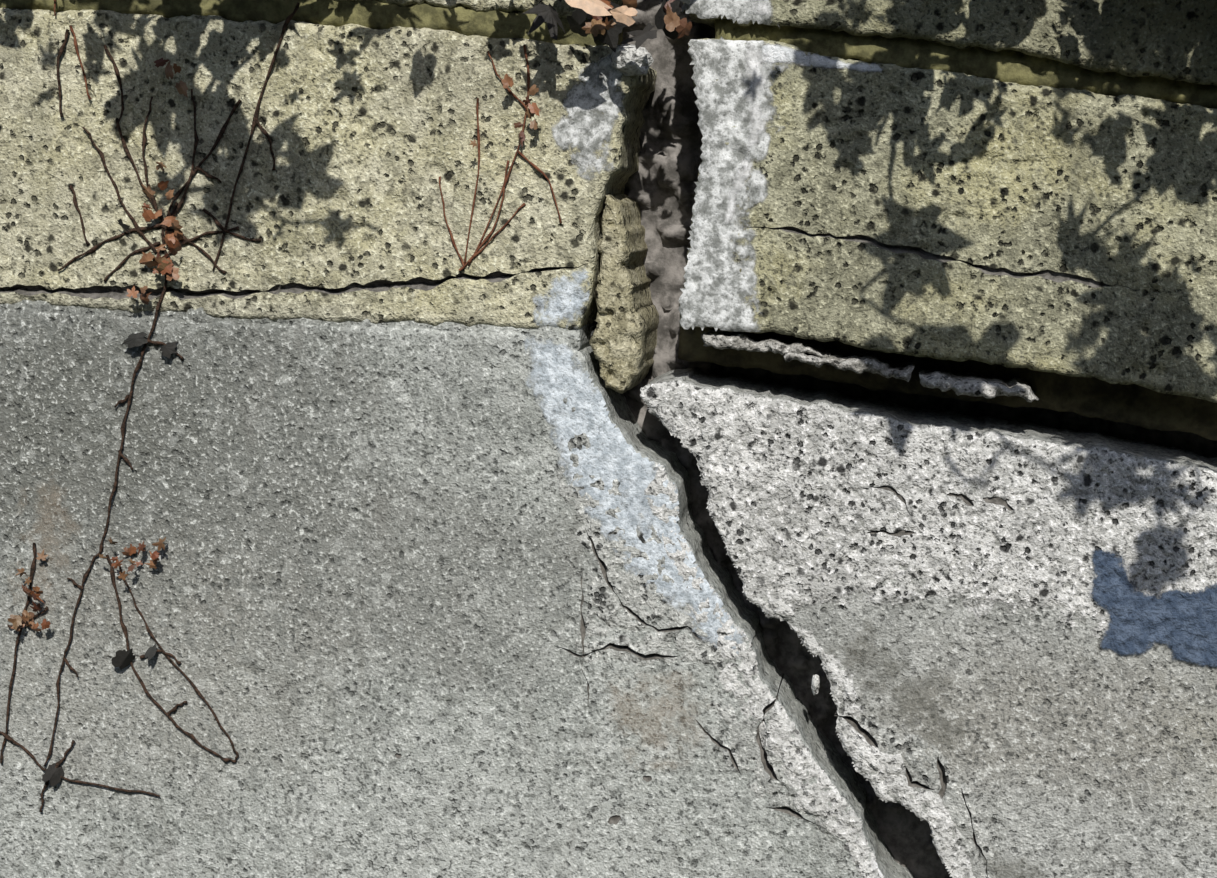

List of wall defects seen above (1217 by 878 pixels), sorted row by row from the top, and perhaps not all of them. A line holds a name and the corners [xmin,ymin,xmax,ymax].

crack [0,264,586,300]
crack [746,226,1138,291]
crack [947,493,1014,511]
crack [555,530,709,701]
crack [623,379,988,878]